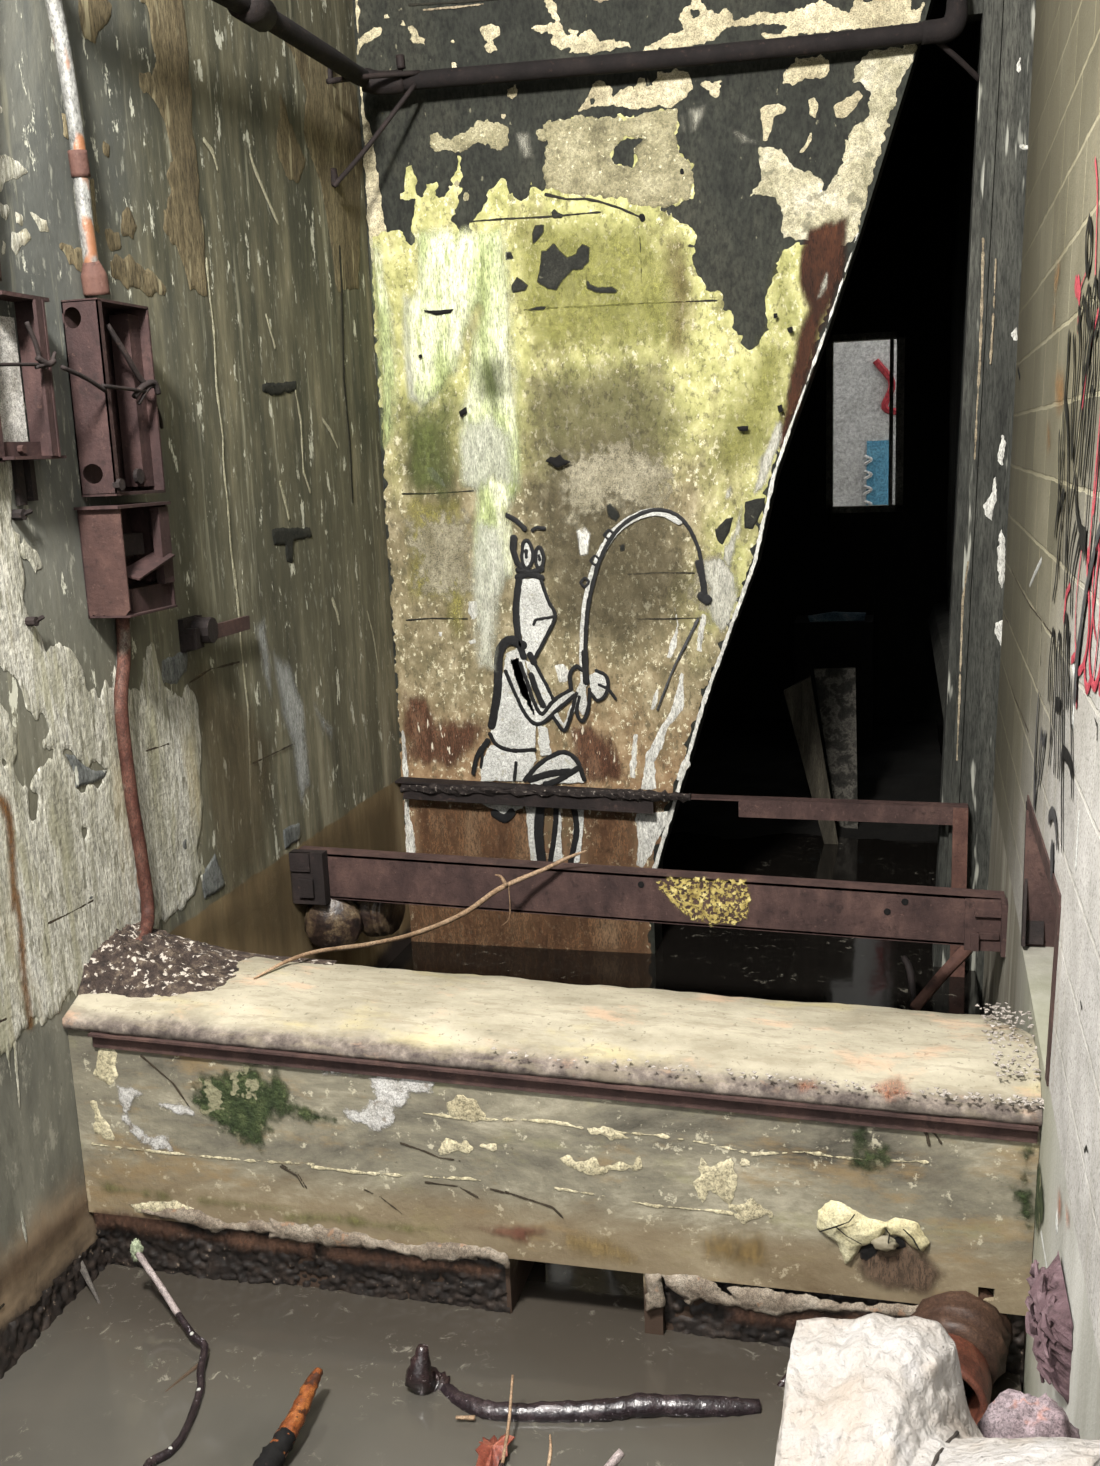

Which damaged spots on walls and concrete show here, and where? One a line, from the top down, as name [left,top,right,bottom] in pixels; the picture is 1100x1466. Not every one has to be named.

peeling [355,0,425,55]
peeling [531,0,925,55]
corrosion [779,219,846,449]
leakage [406,509,504,665]
flaking render [272,41,917,869]
leakage [542,380,740,658]
peeling [0,542,225,1055]
corrosion [404,697,481,767]
corrosion [400,726,691,866]
leakage [635,811,670,868]
leakage [629,673,684,790]
corrosion [413,905,644,953]